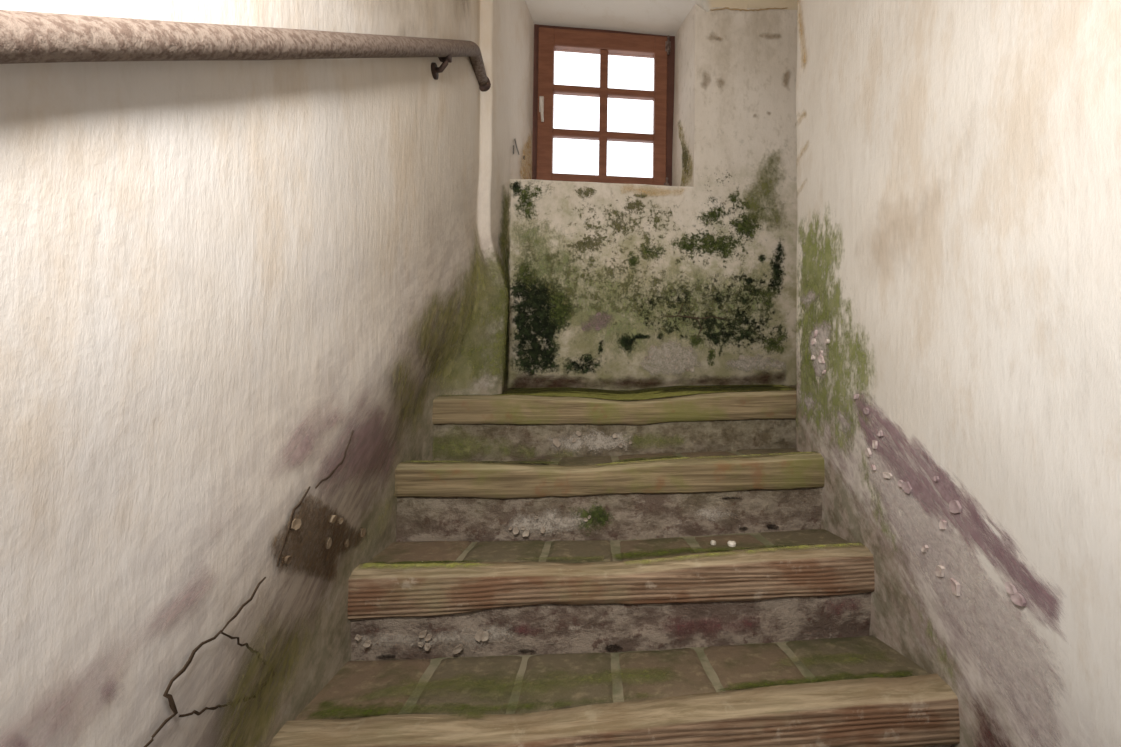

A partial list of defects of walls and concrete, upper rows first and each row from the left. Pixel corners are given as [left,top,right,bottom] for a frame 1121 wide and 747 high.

leakage [501,198,511,251]
leakage [511,376,662,389]
leakage [697,349,784,385]
flaking render [809,322,831,376]
peeling [838,393,1057,624]
peeling [976,706,1010,747]